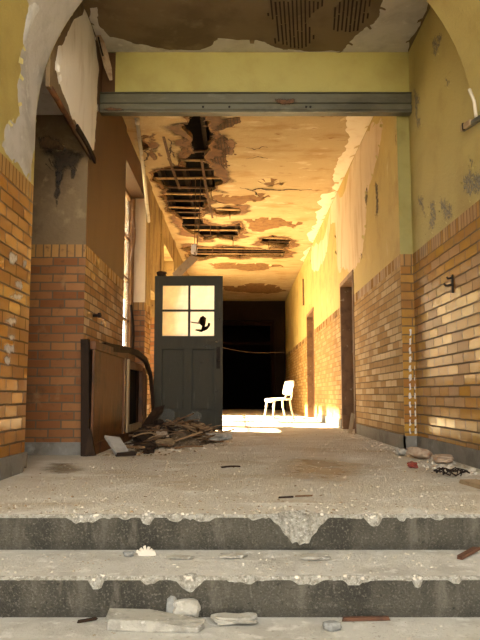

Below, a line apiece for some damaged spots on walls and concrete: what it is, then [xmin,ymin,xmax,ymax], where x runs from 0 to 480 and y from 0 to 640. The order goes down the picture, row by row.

peeling [320,0,428,53]
peeling [2,0,306,182]
damp [39,135,83,204]
peeling [301,116,383,273]
peeling [243,217,303,233]
spalling [65,513,104,523]
spalling [166,512,216,522]
spalling [270,510,329,545]
spalling [88,574,106,589]
spalling [175,573,205,592]
spalling [290,574,323,585]
spalling [343,574,365,585]